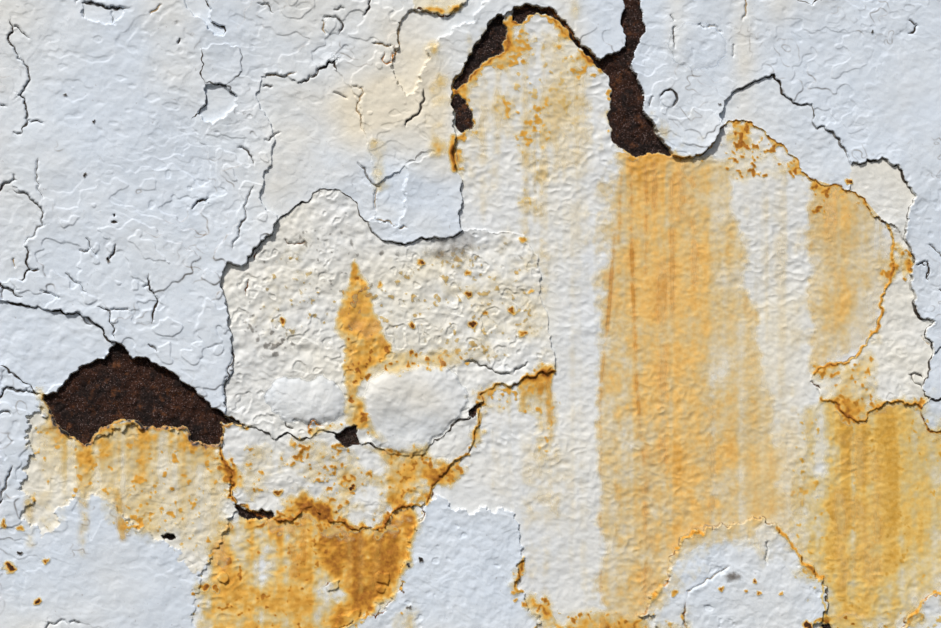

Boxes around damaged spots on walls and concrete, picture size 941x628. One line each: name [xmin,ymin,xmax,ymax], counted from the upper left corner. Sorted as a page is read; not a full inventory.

crack [75,0,161,22]
rust [424,4,462,14]
crack [7,21,41,130]
crack [263,61,365,132]
peeling [0,183,44,283]
crack [0,160,50,299]
crack [0,365,41,414]
peeling [0,301,116,394]
rust [35,250,556,628]
peeling [18,0,651,628]
rust [432,0,941,628]
peeling [689,74,941,563]